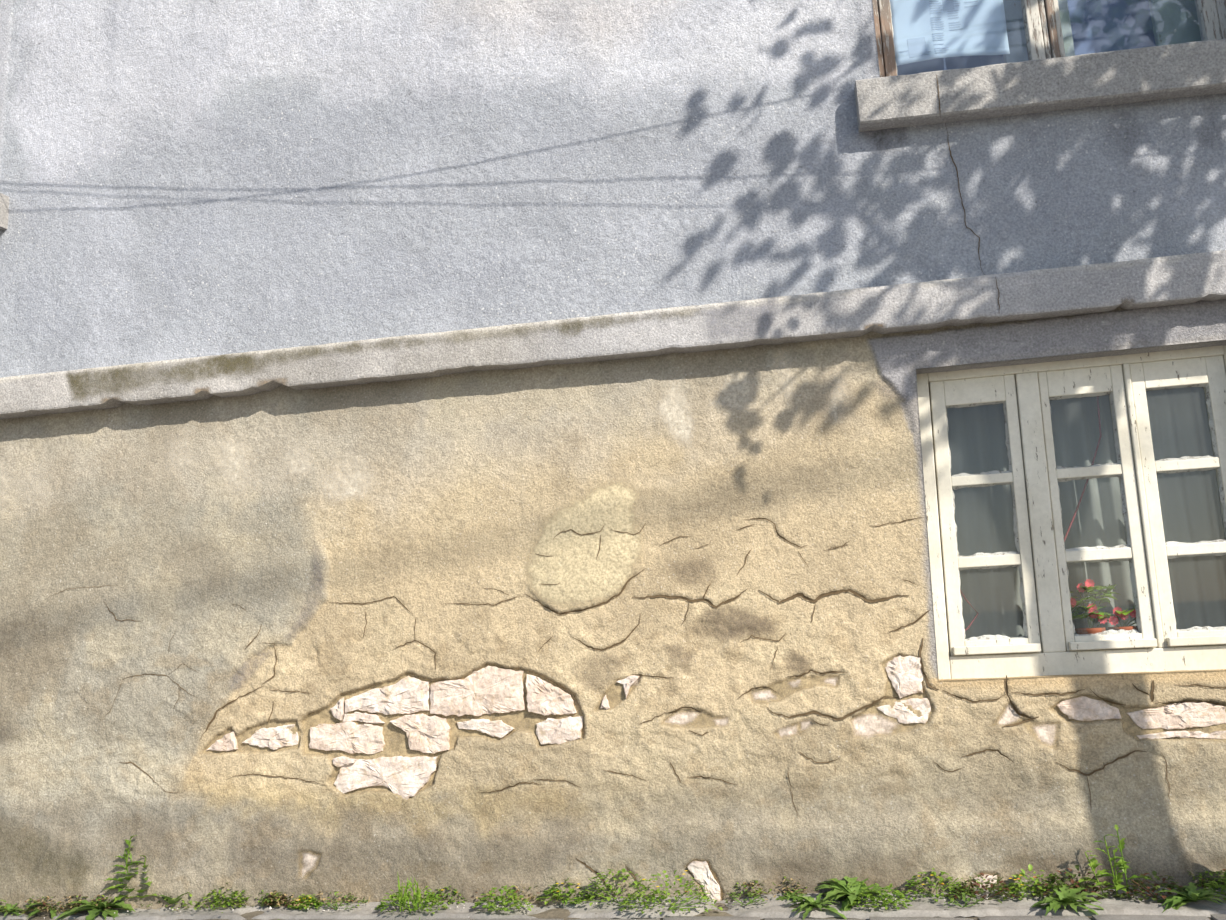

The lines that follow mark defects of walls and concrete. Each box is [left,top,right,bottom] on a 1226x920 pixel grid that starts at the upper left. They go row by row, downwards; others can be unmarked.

crack [936,75,1000,309]
water stain [161,356,263,379]
crack [329,596,436,666]
crack [445,518,1226,772]
spalling [203,663,640,800]
spalling [852,655,934,736]
spalling [993,695,1226,747]
crack [228,774,327,786]
crack [477,779,581,793]
crack [670,762,736,785]
crack [788,752,839,815]
crack [1056,750,1170,810]